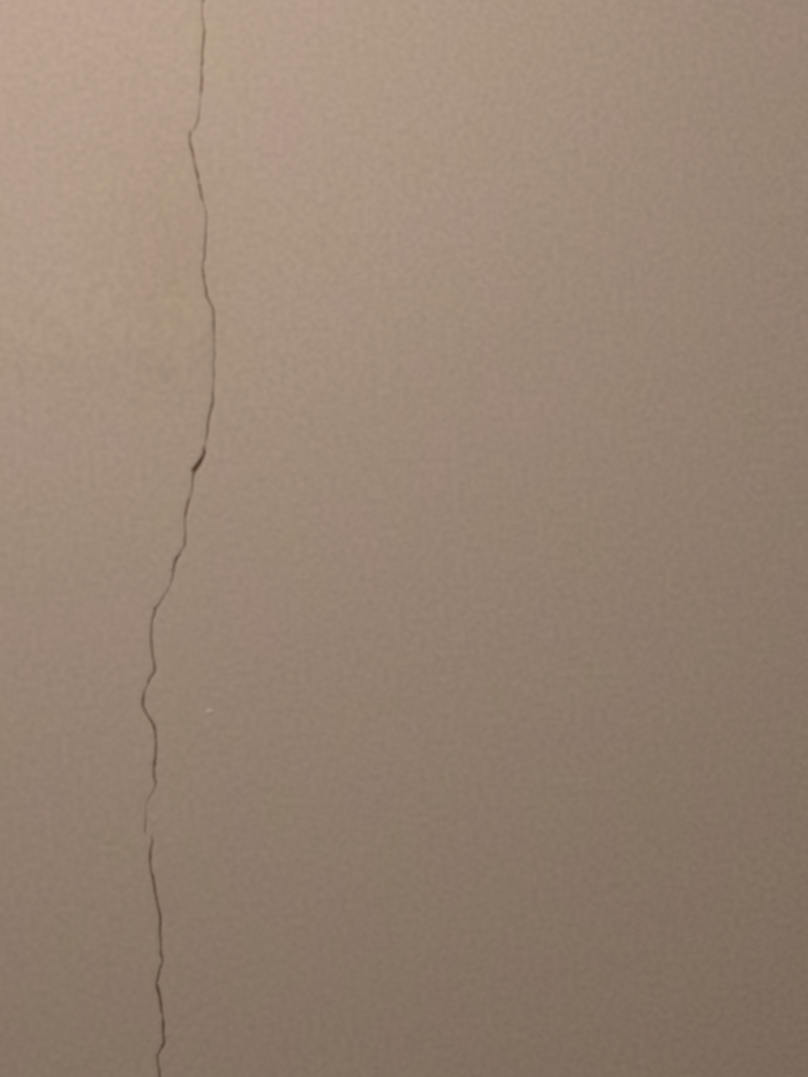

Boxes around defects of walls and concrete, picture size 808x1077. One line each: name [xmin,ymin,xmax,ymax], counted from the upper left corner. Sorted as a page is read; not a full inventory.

crack [142,0,215,1077]